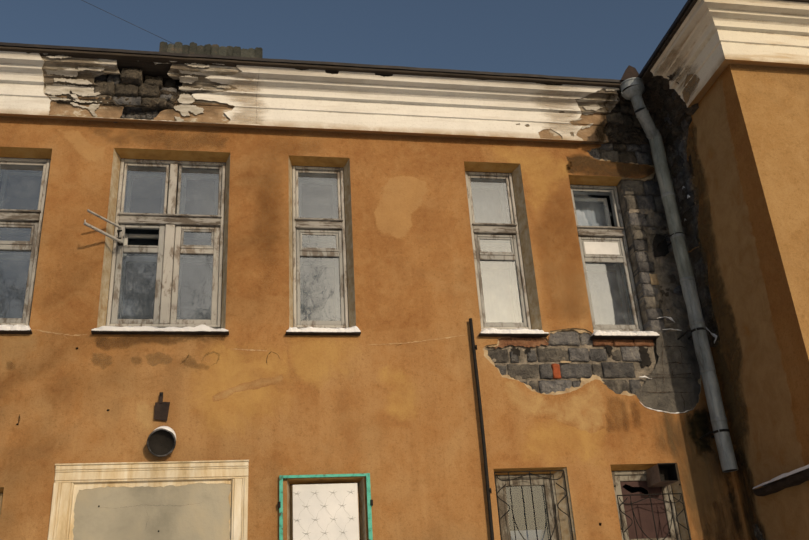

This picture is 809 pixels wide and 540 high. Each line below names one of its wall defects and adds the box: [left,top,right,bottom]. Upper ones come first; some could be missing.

peeling [41,53,242,124]
spalling [483,87,701,413]
spalling [642,72,719,348]
damp [665,127,765,540]